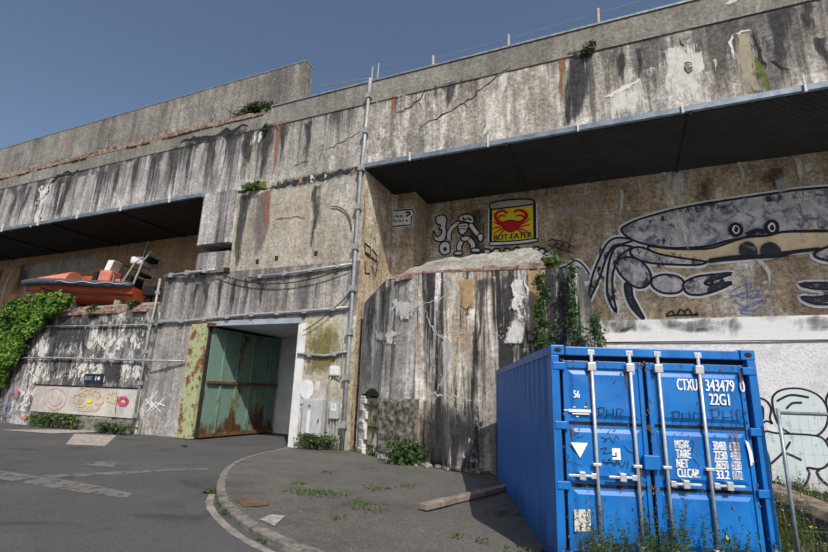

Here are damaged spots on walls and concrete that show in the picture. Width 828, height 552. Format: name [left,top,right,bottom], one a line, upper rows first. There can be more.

crack [396,67,509,129]
leakage [565,50,588,125]
peeling [728,30,767,93]
leakage [801,2,828,62]
leakage [240,121,295,178]
leakage [72,157,140,212]
leakage [235,191,269,265]
corrosion [263,190,305,230]
leakage [311,186,320,246]
leakage [425,273,526,392]
peeling [12,316,149,413]
leakage [423,401,476,465]